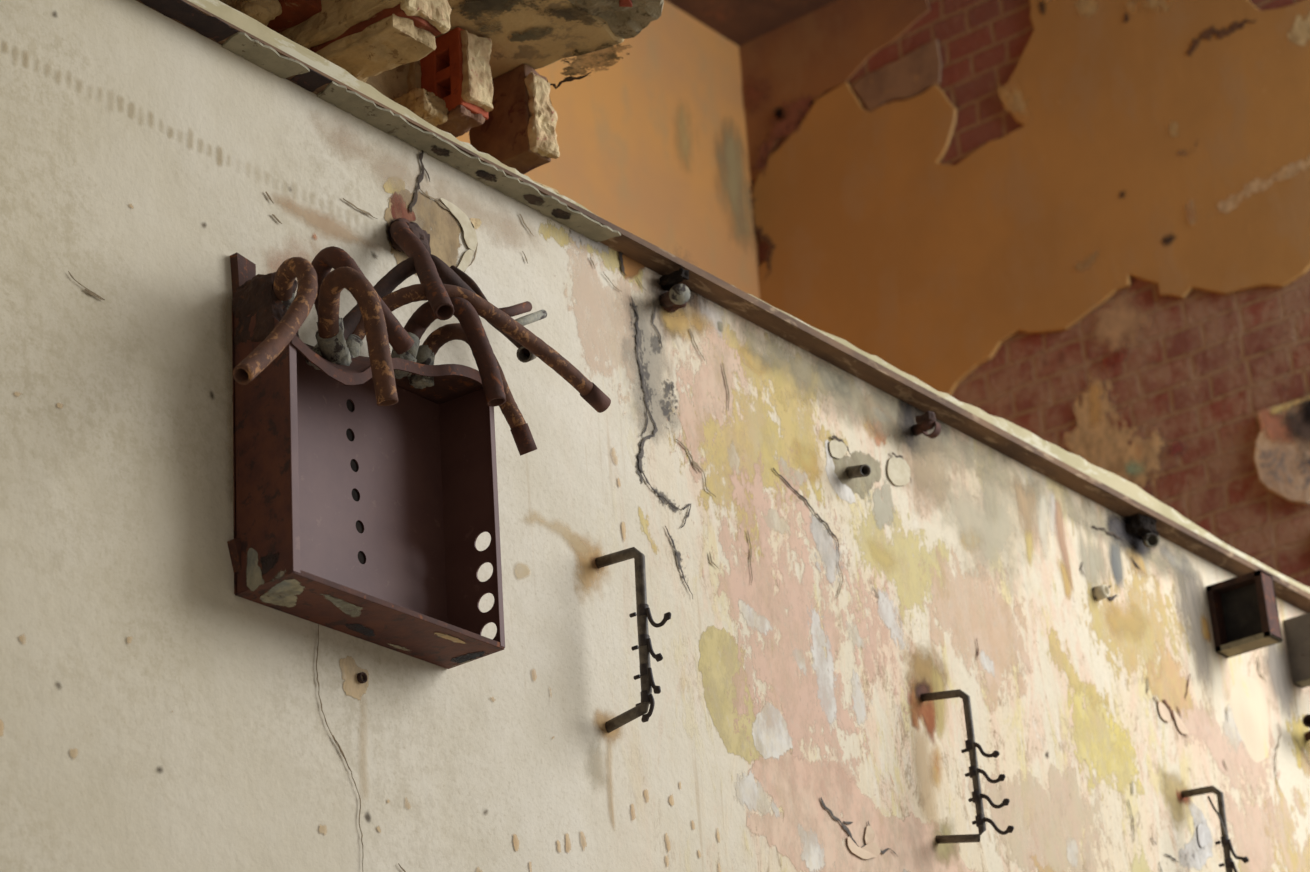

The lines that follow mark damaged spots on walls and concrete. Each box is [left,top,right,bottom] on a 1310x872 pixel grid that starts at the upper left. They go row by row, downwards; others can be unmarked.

spalling [451,0,664,77]
crack [1186,19,1256,56]
peeling [1287,14,1310,46]
peeling [431,145,449,157]
crack [750,188,776,279]
crack [590,252,730,598]
rust [531,517,604,589]
peeling [638,507,659,553]
crack [773,468,843,599]
peeling [666,314,1032,872]
crack [316,625,363,871]
peeling [968,565,1310,872]